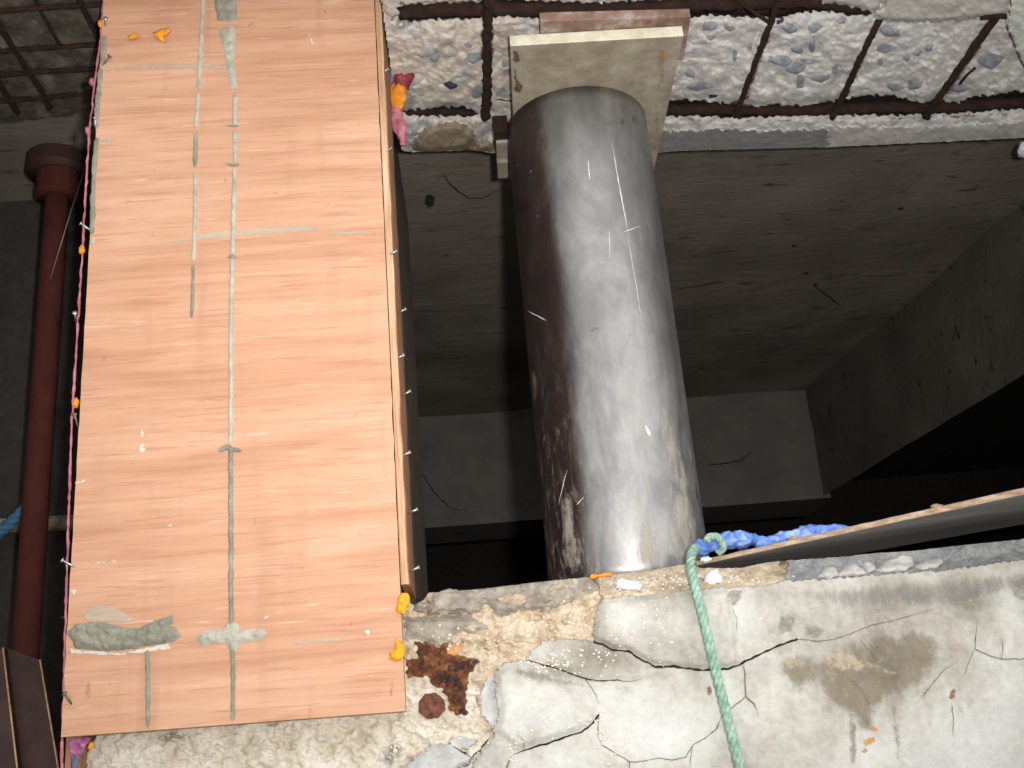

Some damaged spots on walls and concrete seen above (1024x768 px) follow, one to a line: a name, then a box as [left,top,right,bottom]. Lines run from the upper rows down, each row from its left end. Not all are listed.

spalling [381,0,540,153]
spalling [658,0,1024,153]
crack [444,175,499,216]
rust [405,641,479,716]
spalling [87,539,1024,768]
crack [506,609,931,768]
water stain [784,633,931,752]
crack [919,626,1024,700]